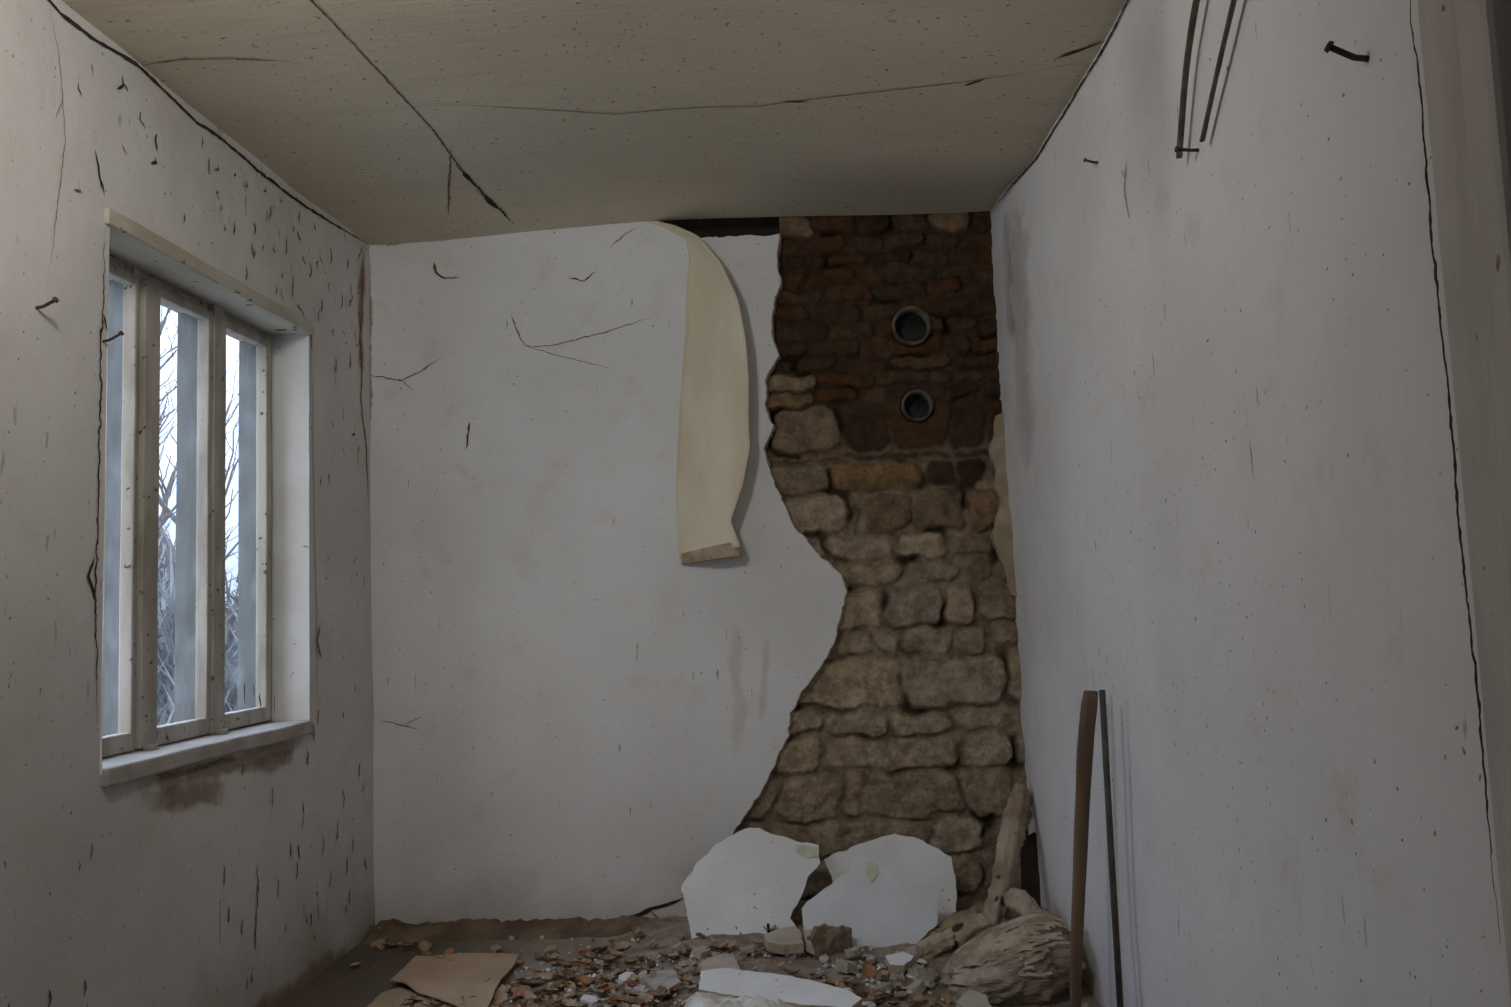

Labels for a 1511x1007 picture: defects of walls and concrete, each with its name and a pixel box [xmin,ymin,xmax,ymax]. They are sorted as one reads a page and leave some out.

crack [310,0,1128,222]
crack [433,263,459,279]
flaking render [644,211,1027,900]
crack [1410,0,1501,944]
water stain [156,741,309,807]